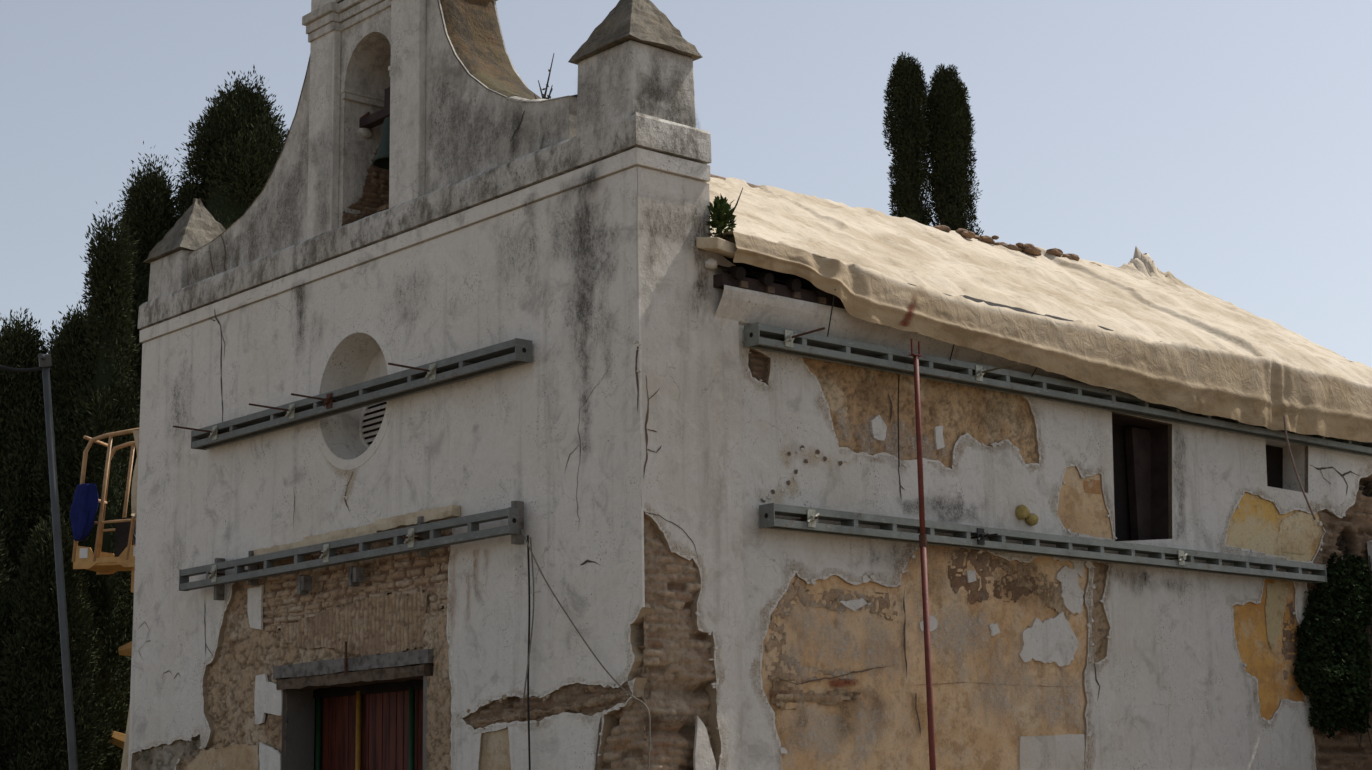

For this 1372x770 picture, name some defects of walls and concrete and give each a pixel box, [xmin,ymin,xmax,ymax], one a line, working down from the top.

crack [564,339,662,528]
spalling [761,357,1043,504]
spalling [1052,463,1117,539]
spalling [135,508,725,770]
spalling [753,533,1112,770]
spalling [1222,474,1372,770]